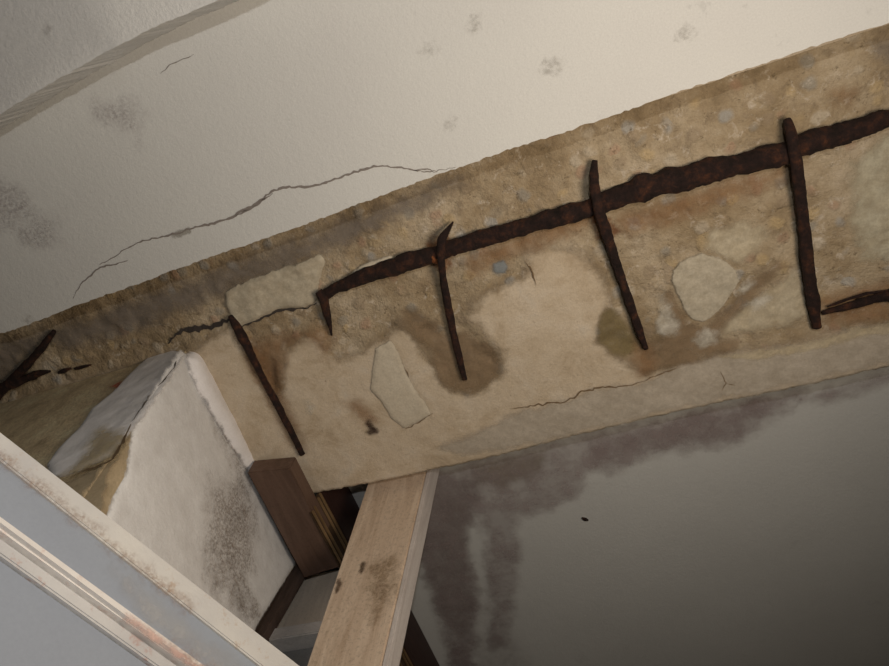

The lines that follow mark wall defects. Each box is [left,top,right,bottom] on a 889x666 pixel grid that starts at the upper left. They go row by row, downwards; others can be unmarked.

crack [73,165,456,298]
spalling [0,24,889,428]
damp [404,311,499,392]
damp [600,271,774,373]
corrosion [826,286,889,317]
flaking render [66,437,131,515]
damp [423,435,639,665]